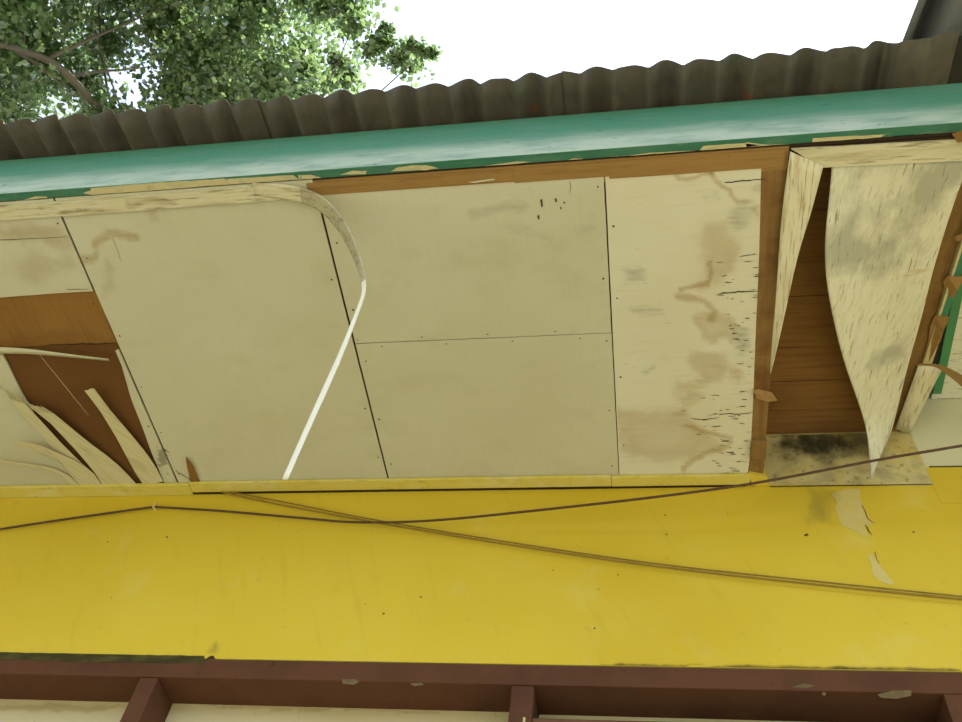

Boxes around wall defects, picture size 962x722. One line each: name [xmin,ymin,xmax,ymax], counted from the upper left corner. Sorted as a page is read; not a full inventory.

peeling [812,131,962,143]
peeling [84,142,785,480]
peeling [0,288,199,485]
leakage [782,433,867,454]
spalling [831,489,875,537]
spalling [867,553,894,585]